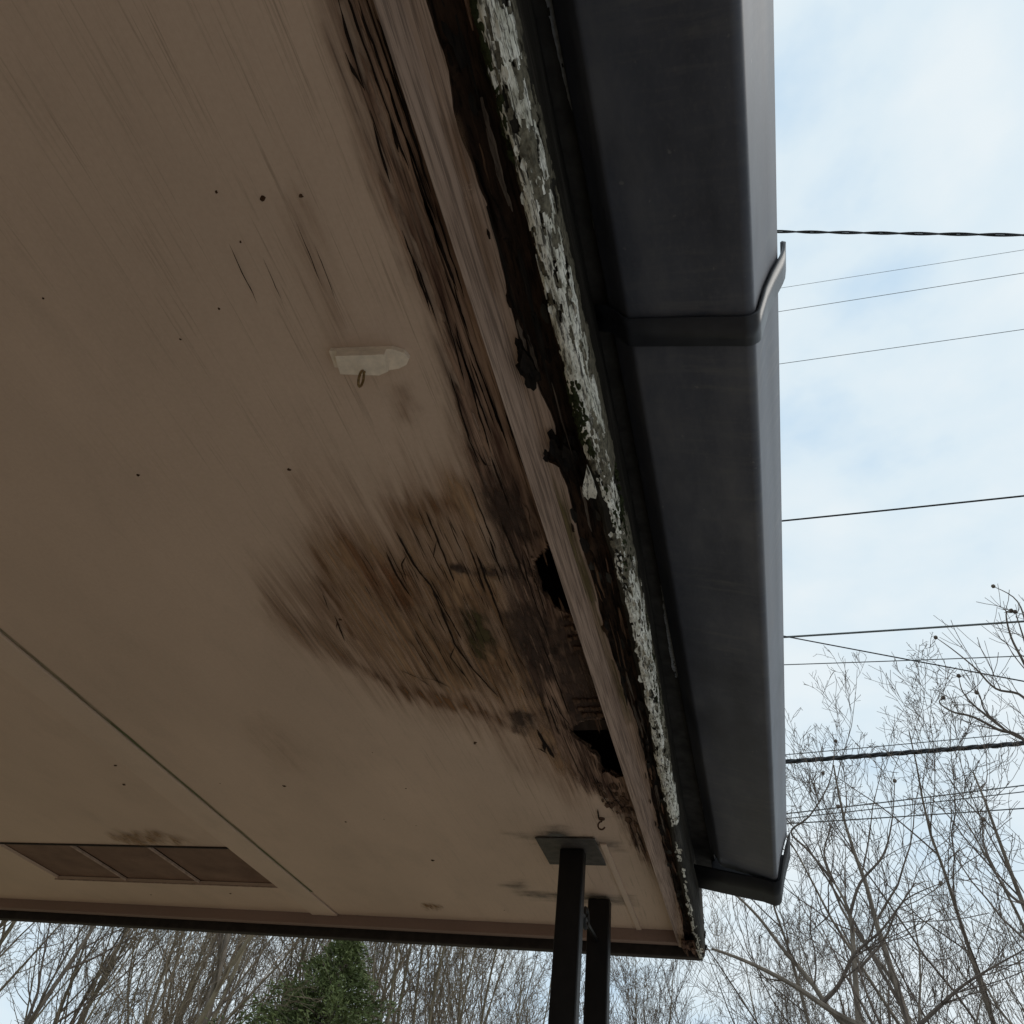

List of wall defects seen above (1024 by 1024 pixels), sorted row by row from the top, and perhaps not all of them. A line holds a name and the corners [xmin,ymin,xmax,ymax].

water stain [278,471,604,787]
crack [338,0,646,853]
peeling [477,0,703,959]